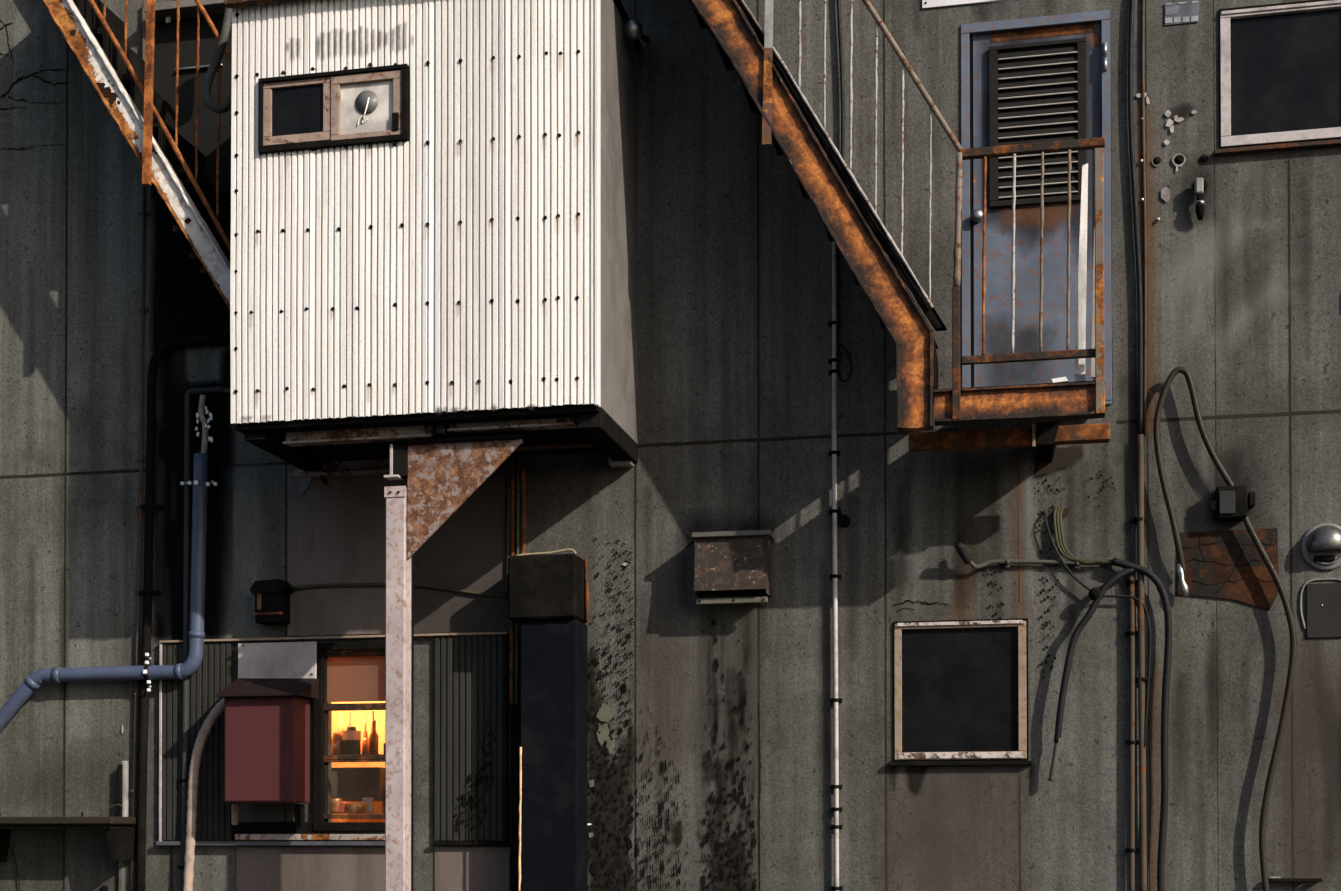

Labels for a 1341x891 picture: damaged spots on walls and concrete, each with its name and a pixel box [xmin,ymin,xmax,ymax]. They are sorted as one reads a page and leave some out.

crack [0,19,67,110]
damp [588,552,689,891]